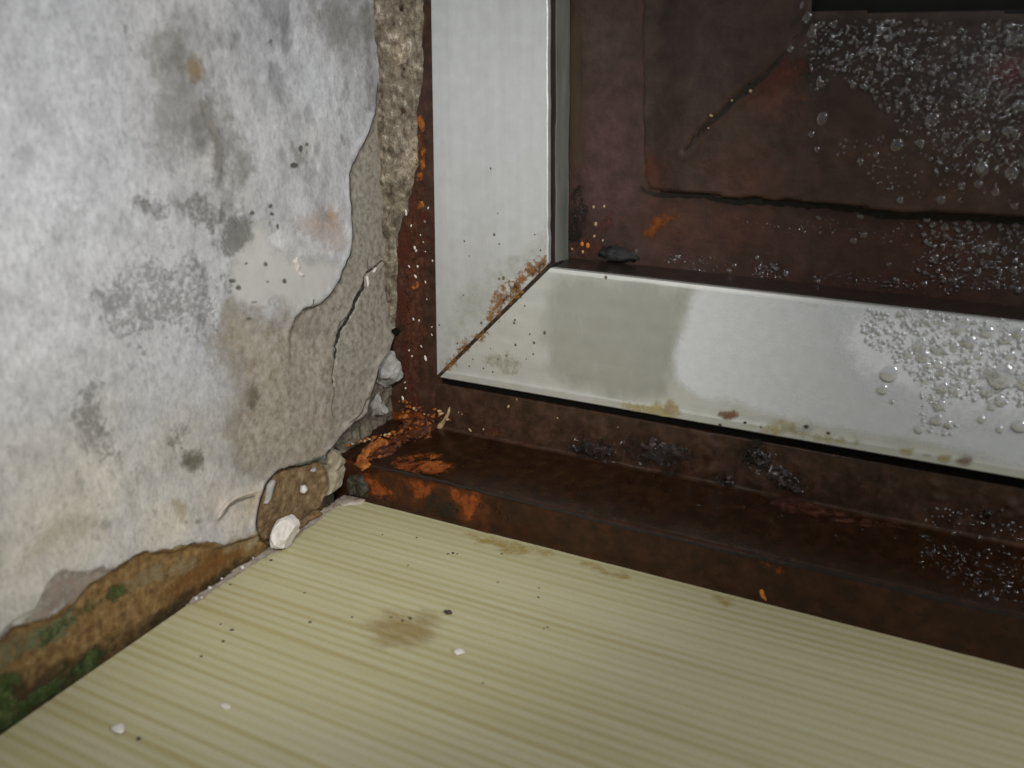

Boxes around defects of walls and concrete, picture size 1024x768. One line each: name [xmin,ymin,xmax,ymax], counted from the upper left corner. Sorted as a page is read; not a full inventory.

damp [0,532,270,718]
spalling [217,461,328,541]
flaking render [227,85,395,437]
crack [256,254,382,537]
rust [345,115,500,533]
rust [446,249,546,373]